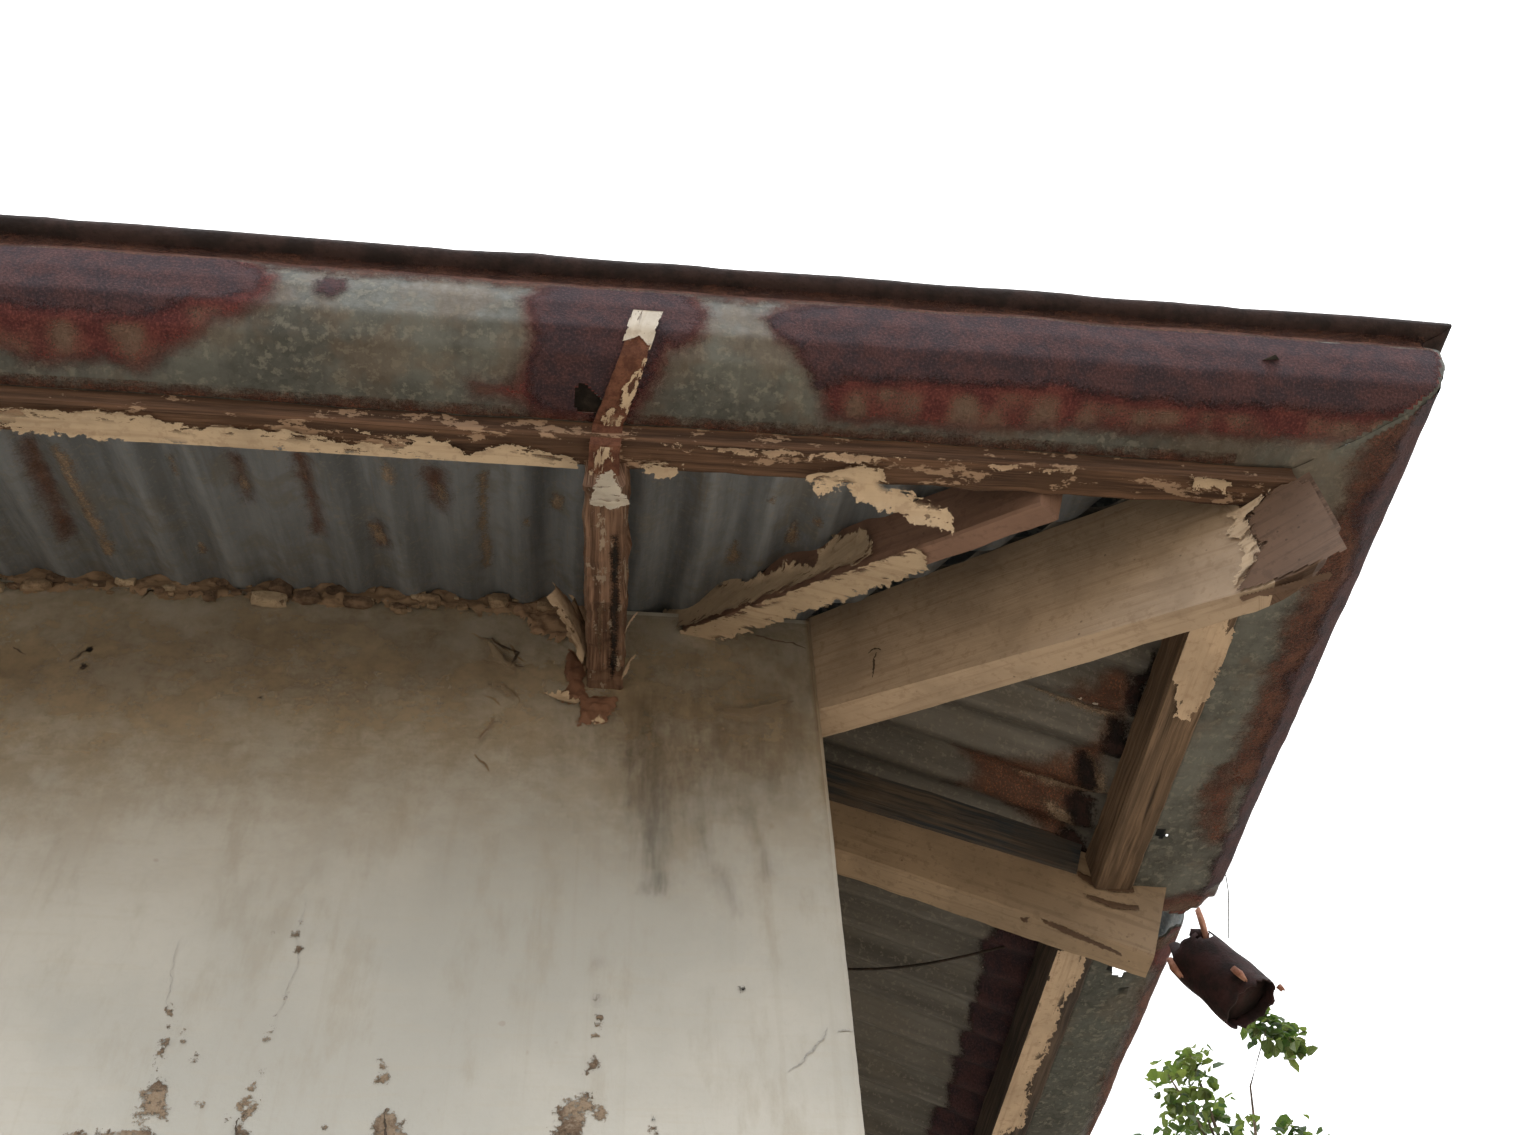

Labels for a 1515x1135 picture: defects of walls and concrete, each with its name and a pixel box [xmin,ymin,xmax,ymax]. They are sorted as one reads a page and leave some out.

peeling [600,309,663,426]
peeling [0,407,629,510]
peeling [639,442,955,536]
peeling [988,464,1076,475]
spalling [0,534,638,727]
rust [0,232,1446,1135]
peeling [663,527,930,641]
flaking render [67,1003,198,1135]
flaking render [224,1072,264,1135]
flaking render [370,1108,407,1135]
flaking render [546,996,608,1135]
peeling [992,917,1122,1135]